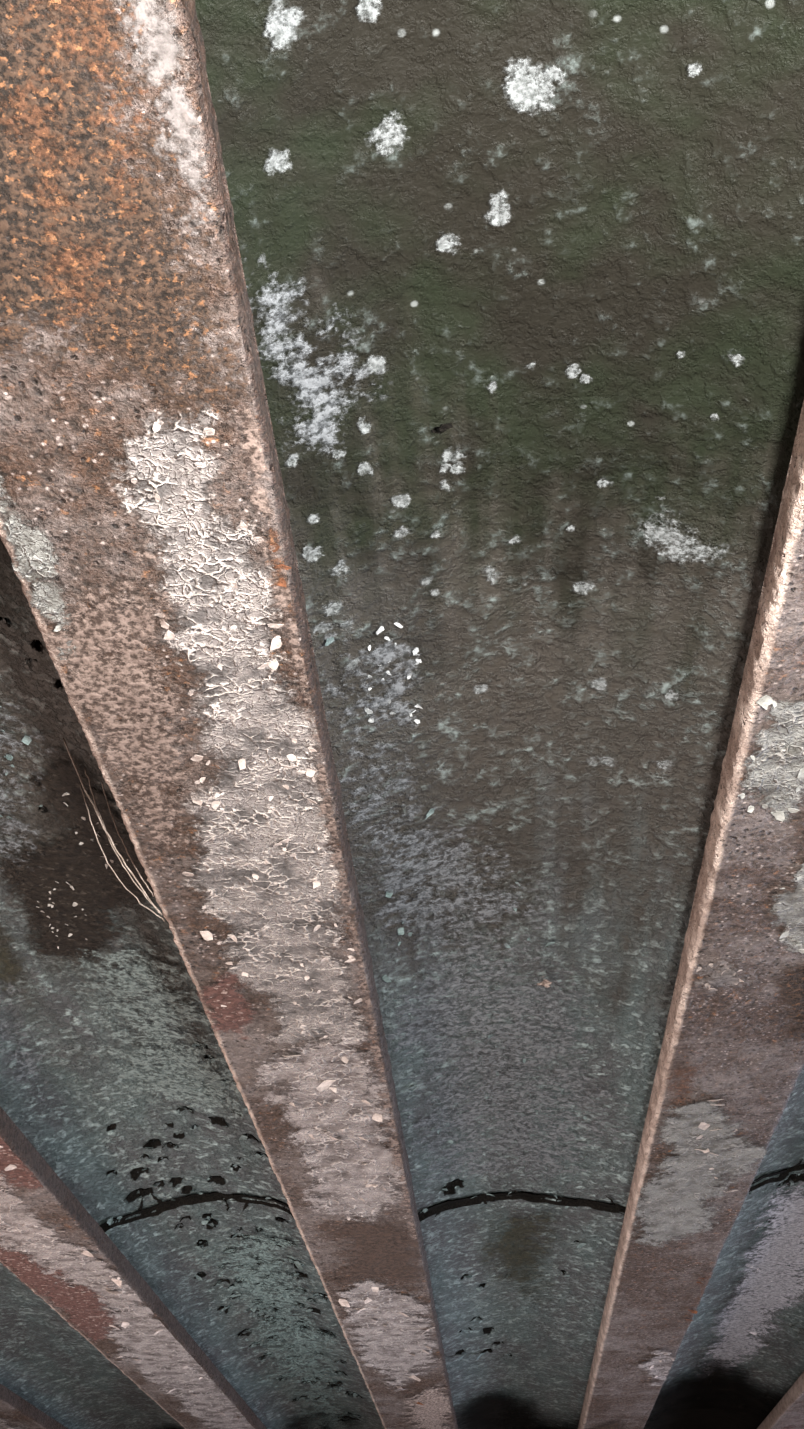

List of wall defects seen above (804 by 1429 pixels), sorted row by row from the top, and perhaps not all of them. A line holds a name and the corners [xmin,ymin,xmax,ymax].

corrosion [0,0,249,417]
peeling [738,695,804,822]
damp [0,704,247,1118]
peeling [768,863,804,954]
crack [100,1192,294,1236]
crack [418,1189,626,1222]
crack [748,1159,804,1194]
damp [644,1186,804,1429]